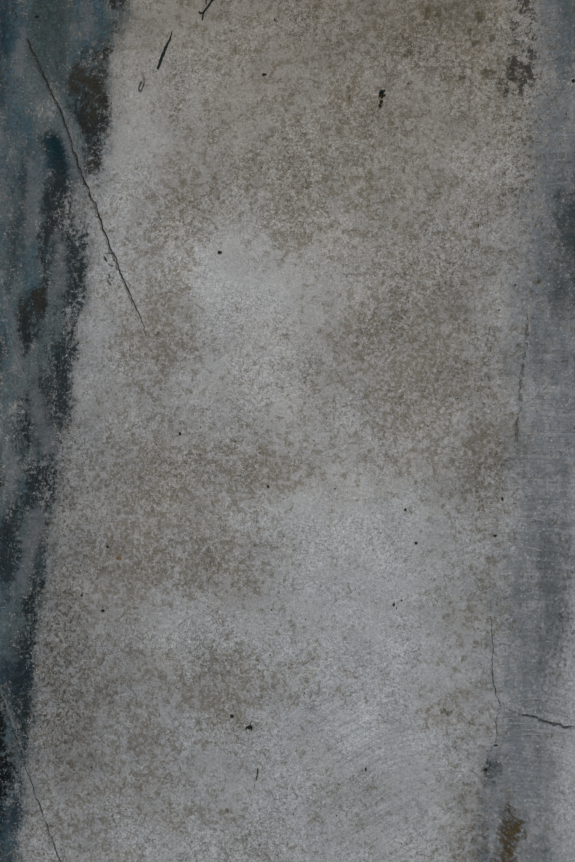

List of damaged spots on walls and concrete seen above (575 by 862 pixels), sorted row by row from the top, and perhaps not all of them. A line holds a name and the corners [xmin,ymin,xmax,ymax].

crack [27,38,146,335]
water stain [0,0,131,862]
water stain [483,0,575,862]
corrosion [494,805,527,862]
crack [486,617,575,777]